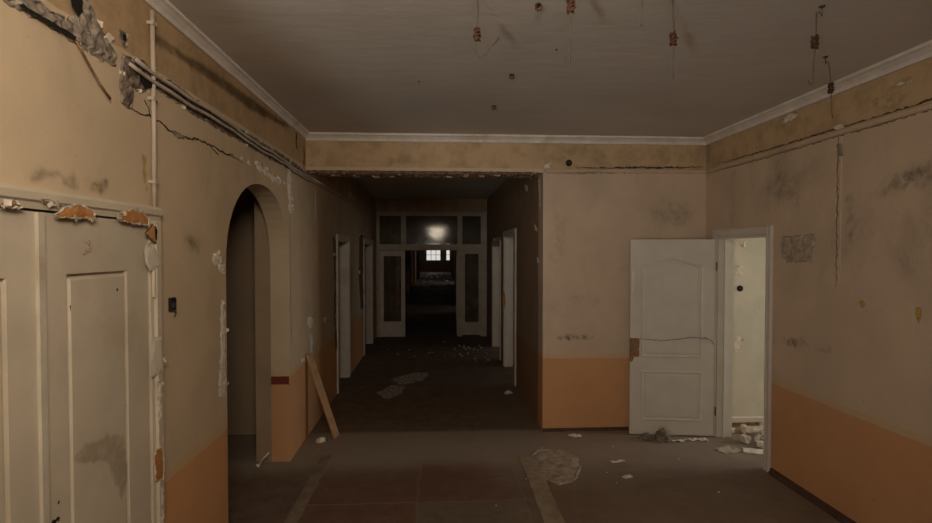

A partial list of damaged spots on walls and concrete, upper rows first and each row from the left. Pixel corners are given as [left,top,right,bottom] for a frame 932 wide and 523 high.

crack [121,100,242,163]
spalling [0,0,551,214]
peeling [41,198,96,222]
peeling [117,206,158,244]
crack [548,98,932,285]